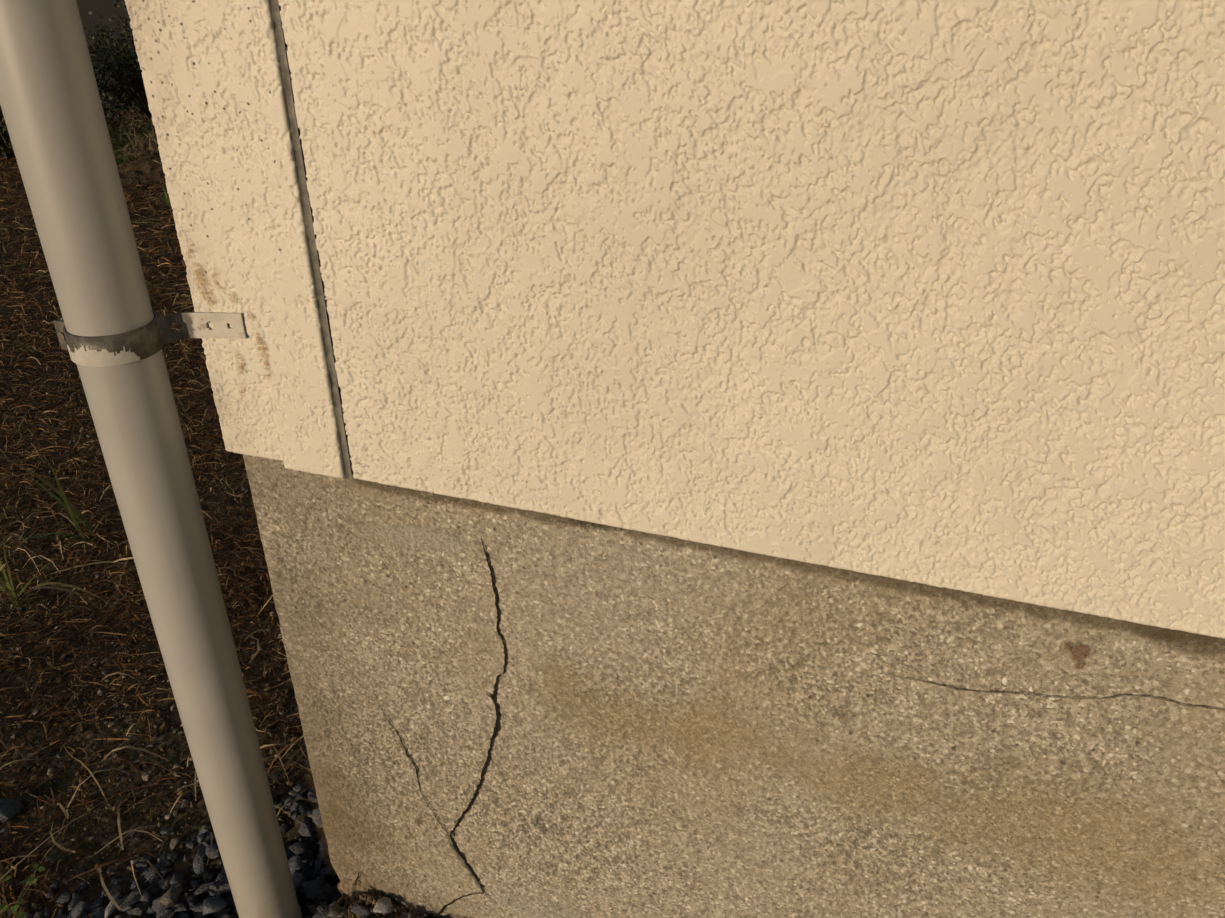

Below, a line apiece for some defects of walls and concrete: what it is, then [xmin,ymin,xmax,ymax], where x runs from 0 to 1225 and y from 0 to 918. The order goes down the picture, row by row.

rust [1064,644,1089,669]
crack [880,673,1225,710]
crack [380,537,507,918]